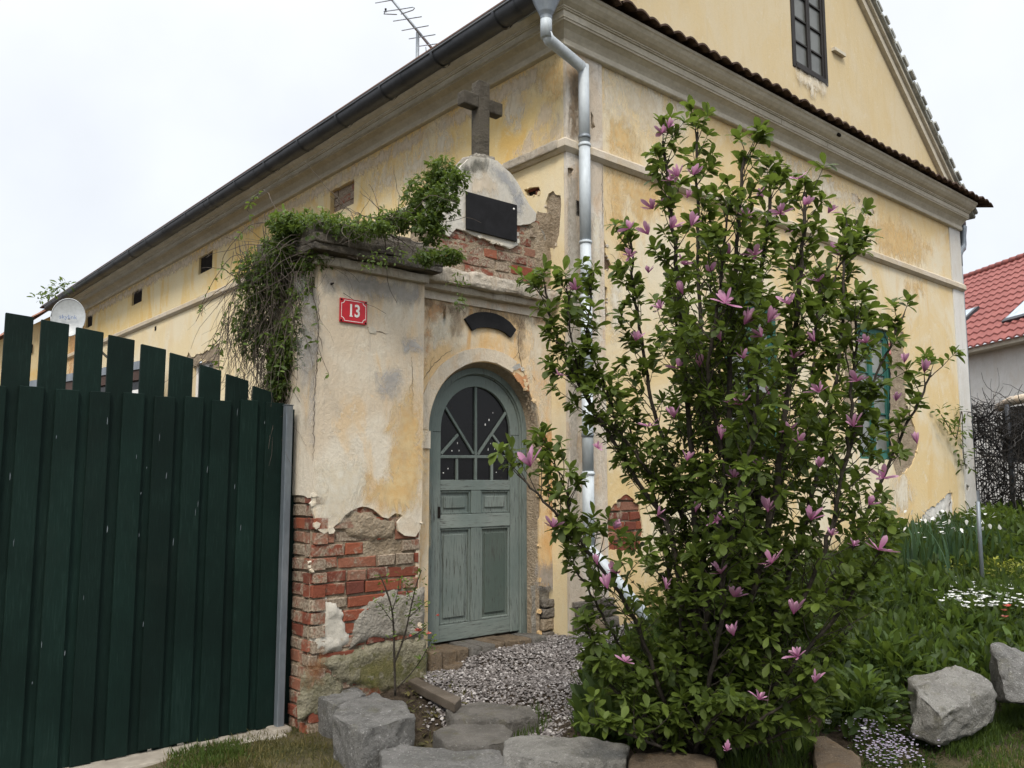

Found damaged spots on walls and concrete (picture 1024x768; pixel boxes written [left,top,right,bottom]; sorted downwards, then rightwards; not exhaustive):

flaking render [410,187,561,289]
flaking render [608,495,644,551]
flaking render [922,492,953,522]
flaking render [288,492,427,734]